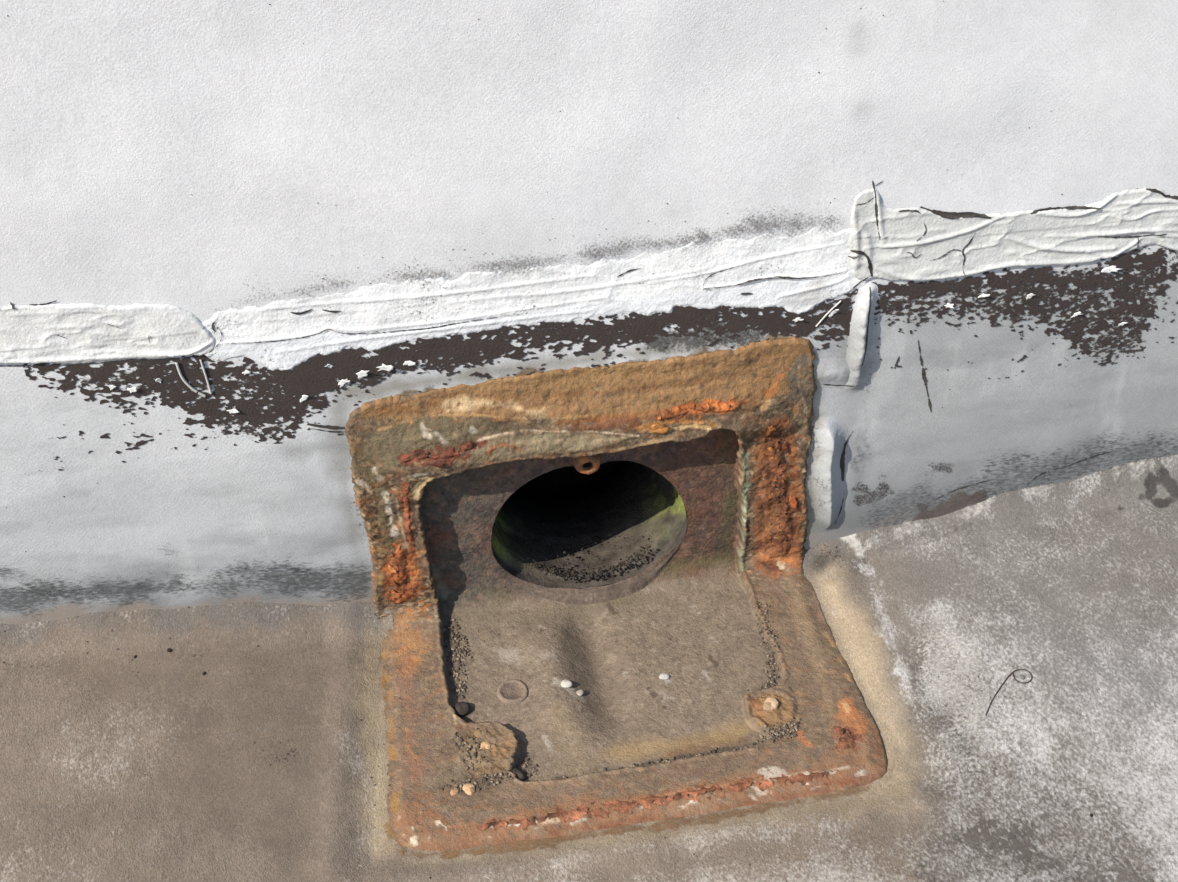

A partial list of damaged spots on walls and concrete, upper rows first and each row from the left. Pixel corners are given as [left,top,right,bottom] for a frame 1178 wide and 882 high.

crack [1031,206,1101,214]
crack [1146,188,1178,200]
crack [0,309,524,367]
peeling [23,289,858,463]
corrosion [649,396,745,434]
crack [702,180,991,387]
crack [894,340,932,412]
peeling [872,246,1178,367]
corrosion [755,421,805,557]
water stain [1131,462,1178,508]
corrosion [381,482,421,604]
corrosion [419,770,868,859]